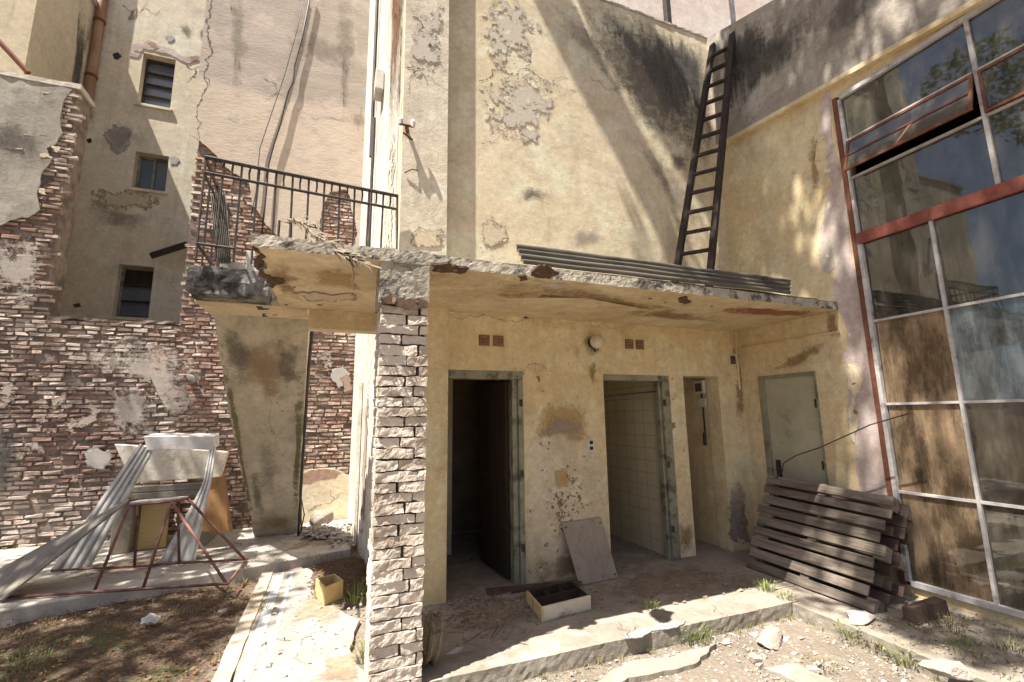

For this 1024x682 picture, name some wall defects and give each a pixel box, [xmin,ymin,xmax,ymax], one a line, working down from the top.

flaking render [130,39,200,64]
crack [186,1,213,141]
peeling [410,0,444,77]
peeling [479,0,560,138]
water stain [577,23,702,145]
water stain [725,19,806,101]
peeling [407,227,445,249]
peeling [480,216,509,249]
corrosion [710,306,810,316]
water stain [227,336,298,393]